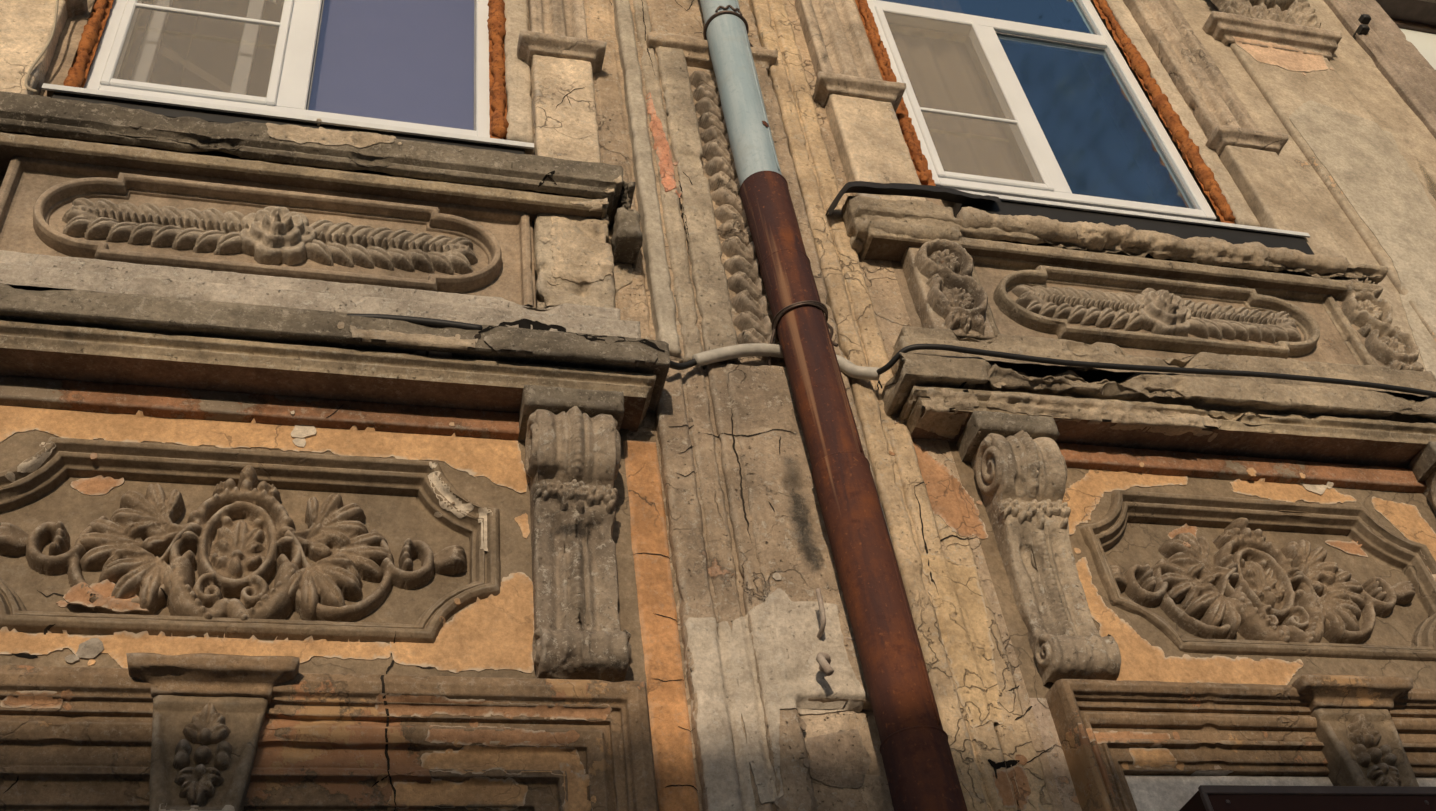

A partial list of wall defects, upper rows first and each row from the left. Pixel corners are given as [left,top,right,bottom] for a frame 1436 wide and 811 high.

spalling [266,119,402,149]
flaking render [646,92,682,198]
peeling [0,405,530,551]
crack [669,409,797,543]
crack [914,482,976,595]
peeling [1062,462,1303,685]
peeling [1230,467,1436,583]
crack [372,634,435,811]
spalling [798,717,871,789]
crack [1008,686,1032,720]
crack [988,747,1052,811]